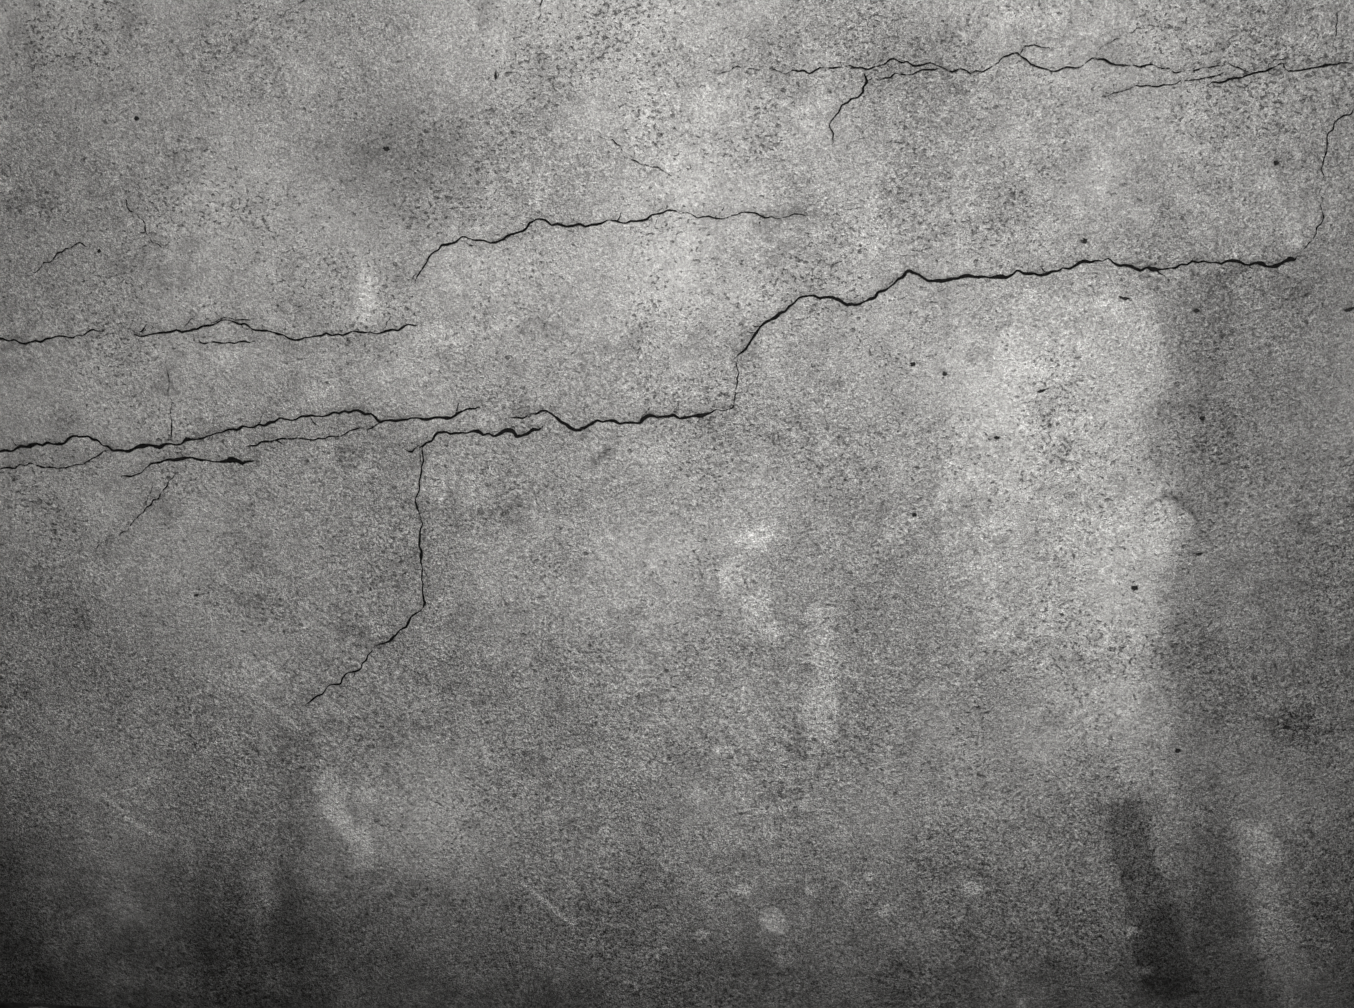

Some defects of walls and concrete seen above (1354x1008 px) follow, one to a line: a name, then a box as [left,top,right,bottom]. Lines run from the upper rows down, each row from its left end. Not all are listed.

crack [694,12,1353,140]
crack [0,109,1354,706]